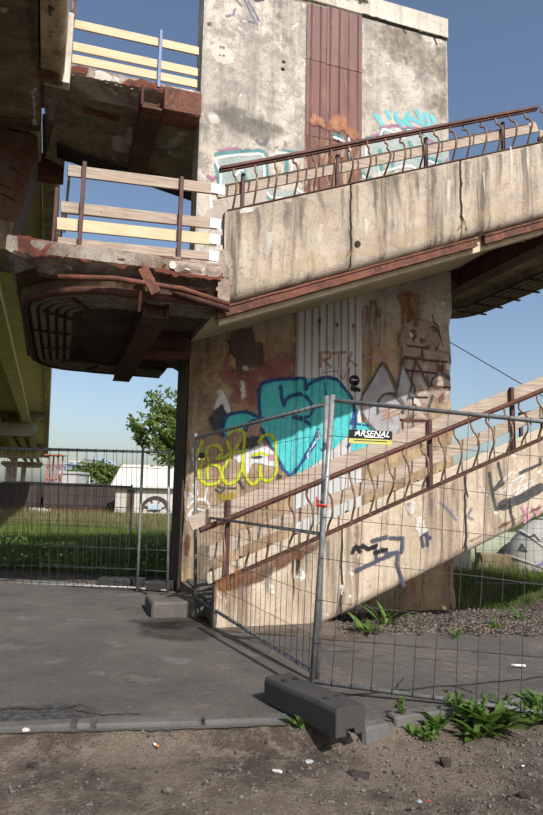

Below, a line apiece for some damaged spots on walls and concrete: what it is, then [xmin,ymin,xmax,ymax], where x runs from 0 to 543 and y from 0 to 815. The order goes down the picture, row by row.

crack [362,13,448,45]
peeling [95,70,141,92]
rust [308,114,359,161]
crack [345,185,353,258]
crack [457,161,467,231]
spalling [228,327,264,399]
rust [216,539,326,593]